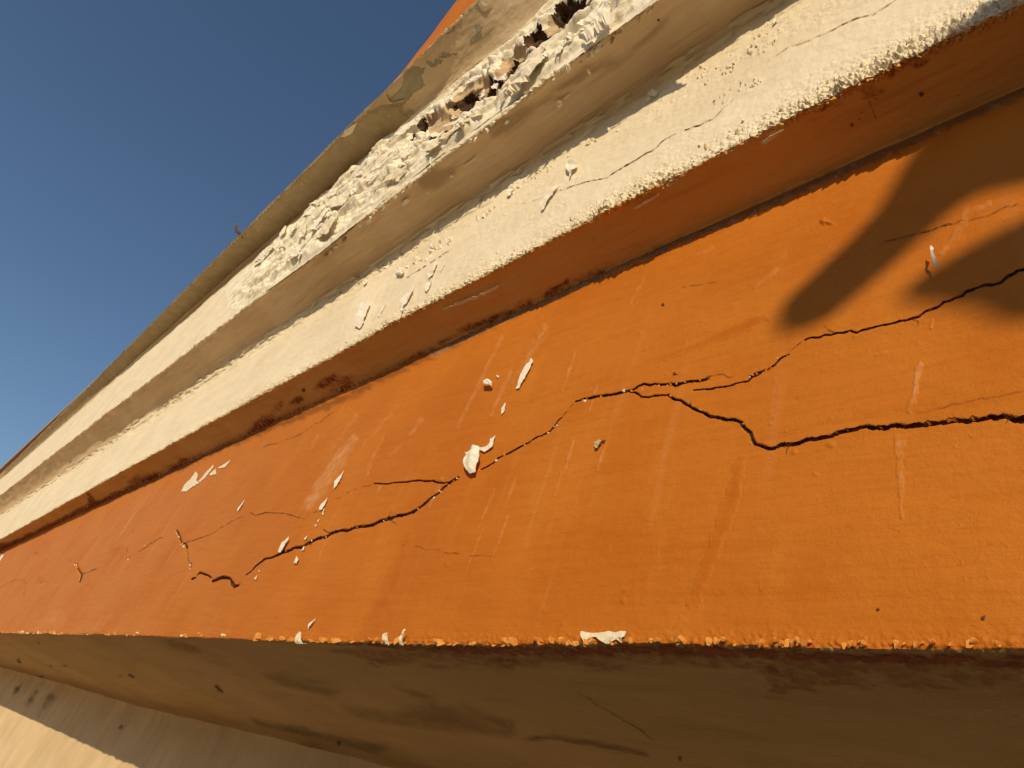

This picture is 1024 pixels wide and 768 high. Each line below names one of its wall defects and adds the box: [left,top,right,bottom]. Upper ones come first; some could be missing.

spalling [4,0,660,476]
crack [125,268,1024,588]
peeling [182,460,230,492]
peeling [294,471,344,564]
peeling [492,637,518,647]
peeling [532,631,633,647]
peeling [705,636,737,647]
peeling [756,636,813,648]
peeling [842,639,867,649]
peeling [893,638,952,649]